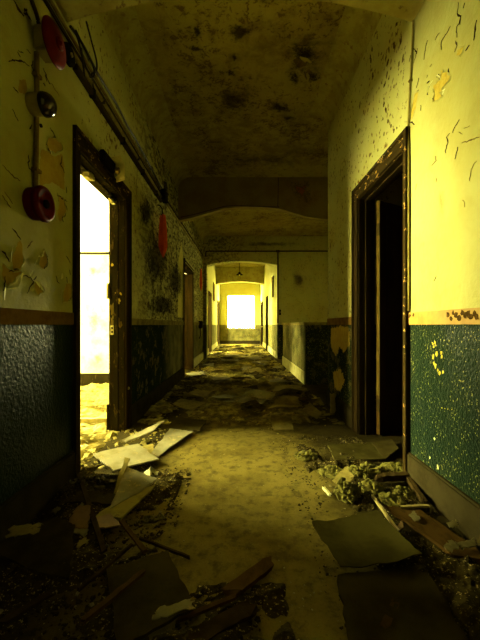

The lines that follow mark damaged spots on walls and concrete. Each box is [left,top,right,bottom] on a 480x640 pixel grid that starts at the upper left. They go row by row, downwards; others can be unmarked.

crack [409,2,477,67]
peeling [427,69,452,103]
crack [431,120,479,181]
peeling [0,228,48,300]
leakage [138,197,182,316]
peeling [331,325,350,356]
peeling [449,310,479,321]
peeling [333,367,345,391]